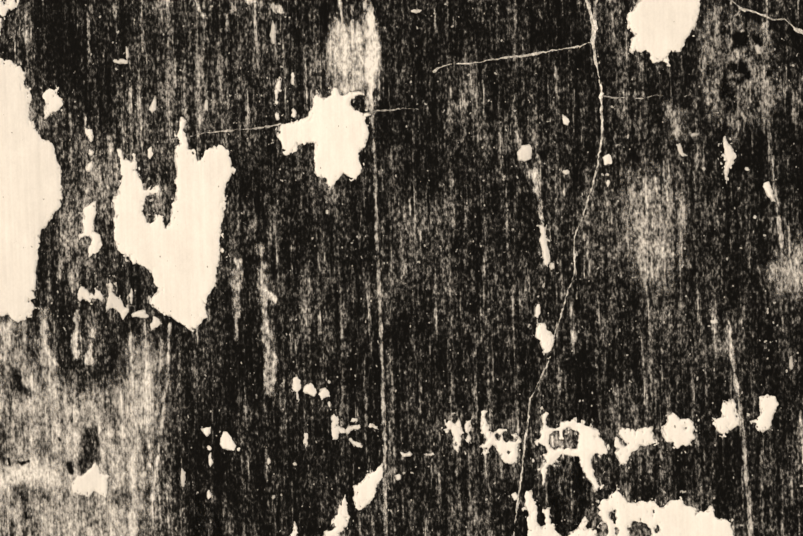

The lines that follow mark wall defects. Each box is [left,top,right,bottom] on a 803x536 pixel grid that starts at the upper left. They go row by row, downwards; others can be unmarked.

peeling [0,0,20,36]
peeling [626,0,700,70]
crack [730,0,803,34]
peeling [274,72,371,191]
peeling [0,58,63,323]
peeling [77,112,236,332]
crack [433,0,660,536]
peeling [71,462,114,498]
peeling [324,463,401,536]
peeling [441,410,522,464]
peeling [511,406,734,536]
peeling [712,394,779,439]